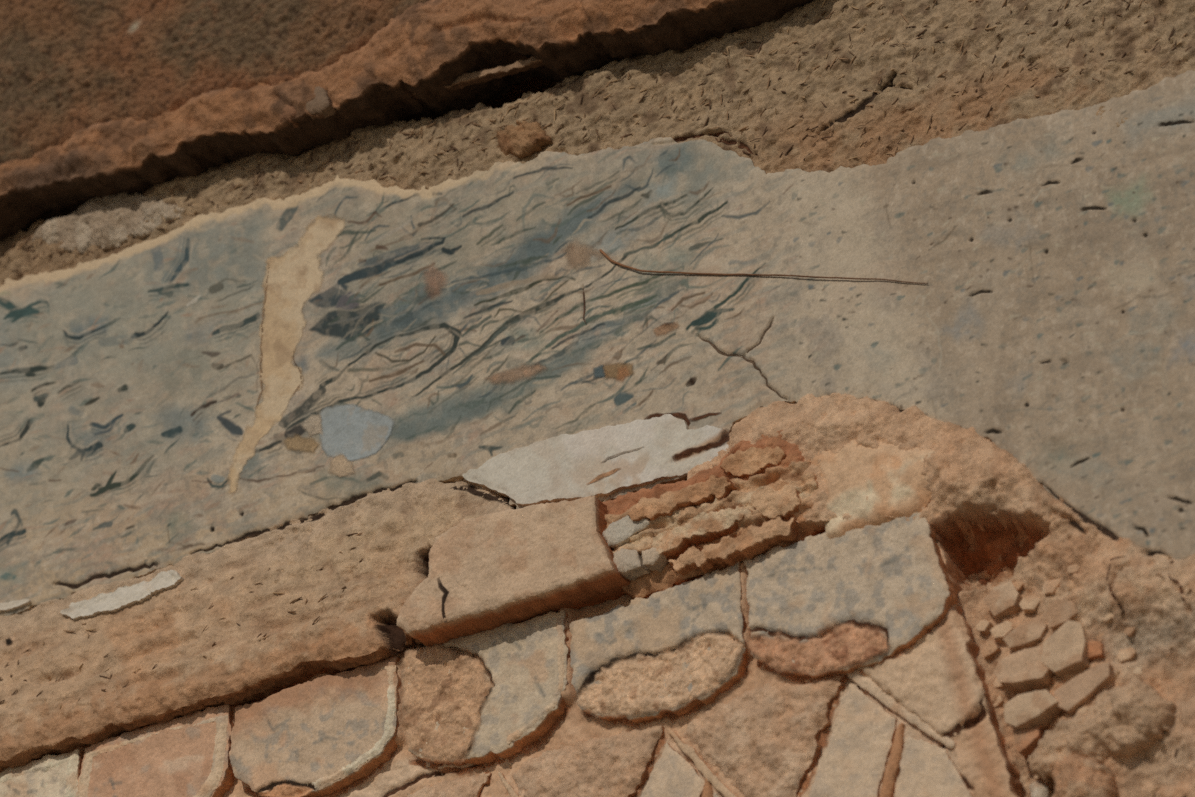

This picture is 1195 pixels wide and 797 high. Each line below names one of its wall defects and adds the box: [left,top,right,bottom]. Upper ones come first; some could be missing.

crack [823,75,910,131]
crack [674,131,756,155]
peeling [228,216,345,493]
crack [700,320,785,399]
peeling [285,404,393,477]
spalling [602,430,825,599]
spalling [936,523,1041,586]